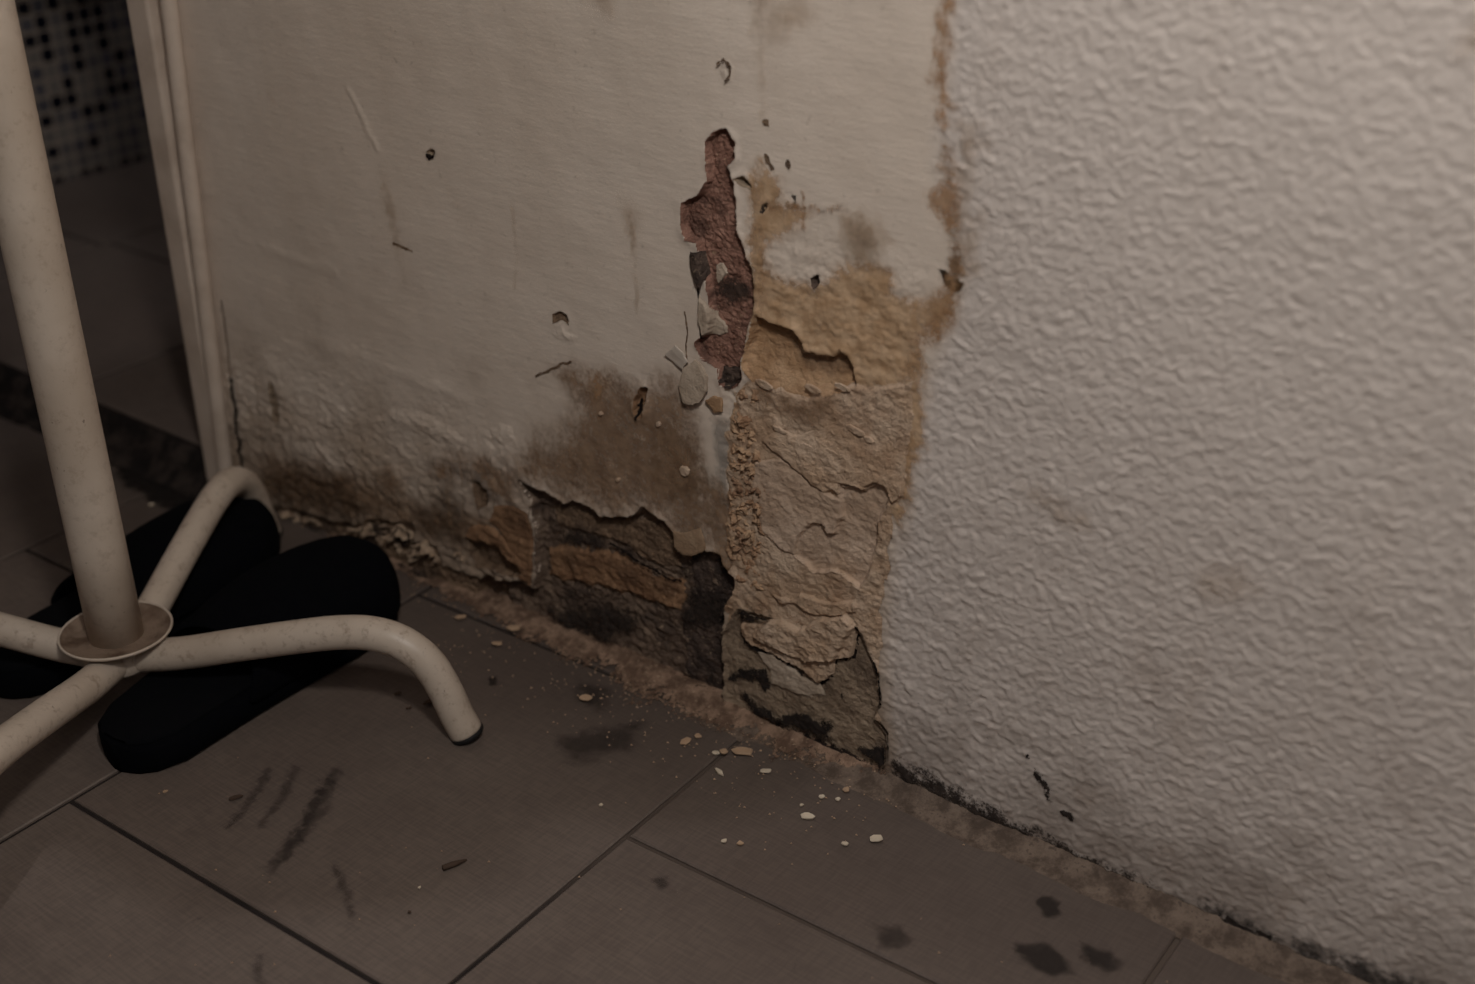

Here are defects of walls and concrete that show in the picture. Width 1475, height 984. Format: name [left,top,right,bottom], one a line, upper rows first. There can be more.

water stain [433,371,709,532]
flaking render [273,128,922,777]
water stain [891,759,1151,888]
water stain [1018,944,1067,974]
water stain [1037,897,1059,916]
water stain [1293,942,1413,984]